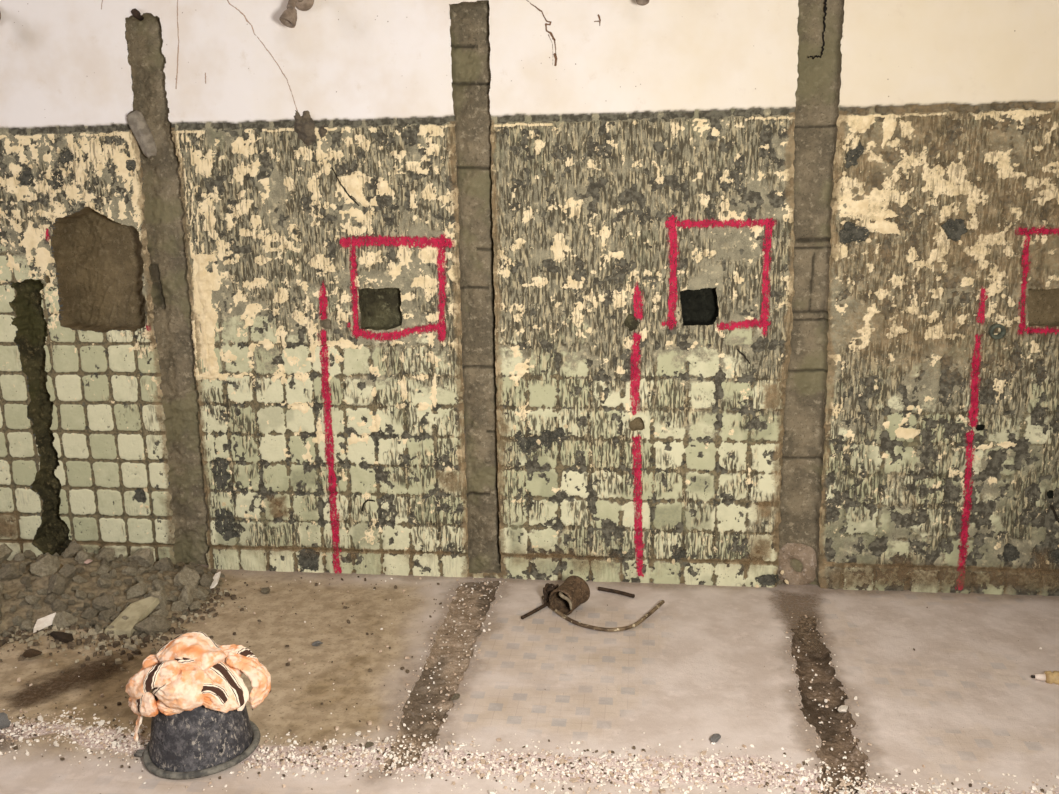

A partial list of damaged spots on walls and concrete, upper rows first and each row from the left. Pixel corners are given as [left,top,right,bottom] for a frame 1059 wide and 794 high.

crack [227,0,298,112]
crack [527,0,557,66]
crack [807,0,827,59]
peeling [842,115,897,176]
peeling [343,174,389,207]
peeling [839,199,901,244]
spalling [935,218,968,245]
peeling [191,254,219,381]
spalling [513,424,568,454]
spalling [211,452,238,541]
spalling [297,548,327,572]
spalling [755,570,789,588]